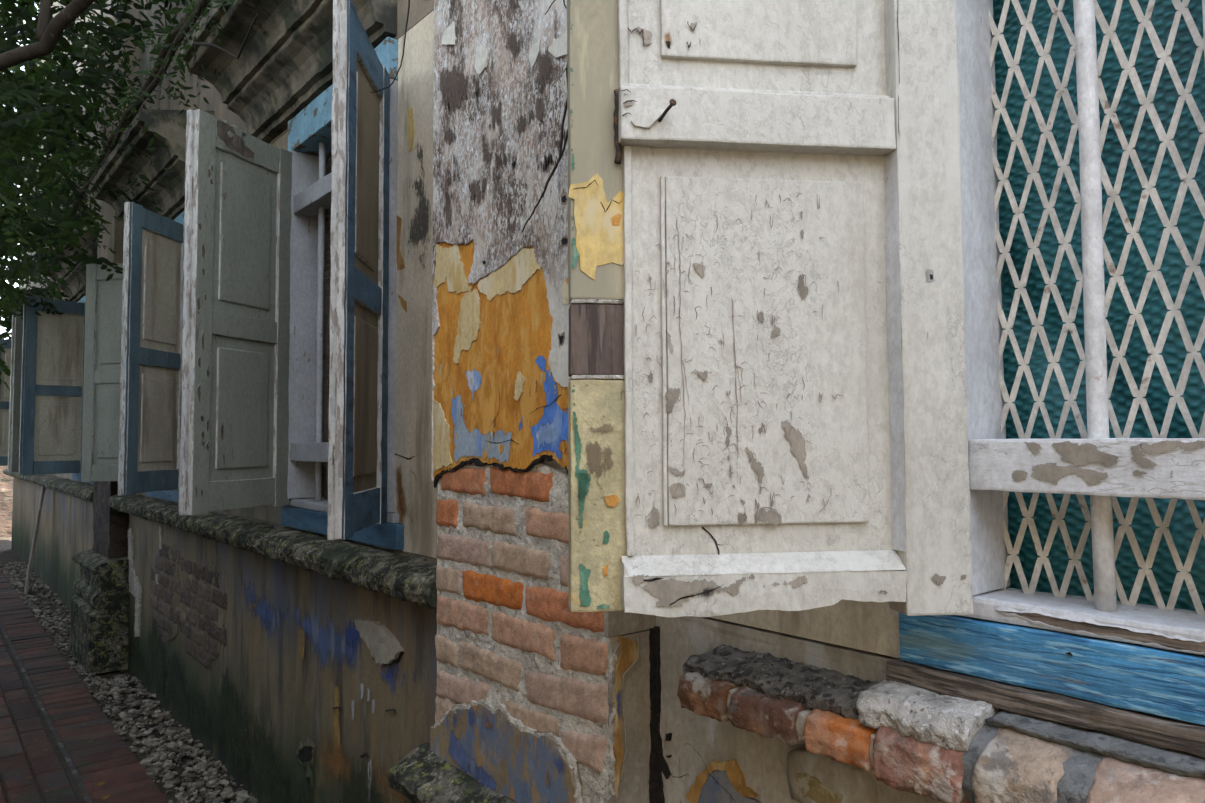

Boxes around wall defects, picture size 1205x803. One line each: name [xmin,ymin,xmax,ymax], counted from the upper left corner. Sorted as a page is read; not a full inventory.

damp [408,30,553,276]
damp [536,110,575,174]
peeling [559,173,673,382]
peeling [666,254,724,350]
peeling [757,267,782,340]
peeling [797,273,809,299]
peeling [665,388,681,425]
peeling [669,359,832,526]
peeling [1012,440,1205,485]
flaking render [433,244,639,803]
peeling [632,574,807,608]
peeling [680,745,761,803]